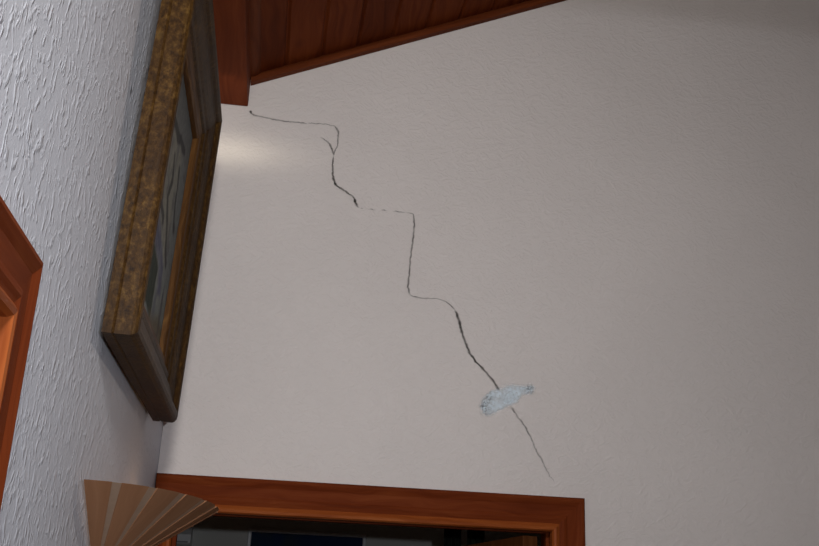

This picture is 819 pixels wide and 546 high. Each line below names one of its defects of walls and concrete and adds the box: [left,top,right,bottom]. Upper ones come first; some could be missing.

crack [314,123,373,210]
crack [446,302,499,389]